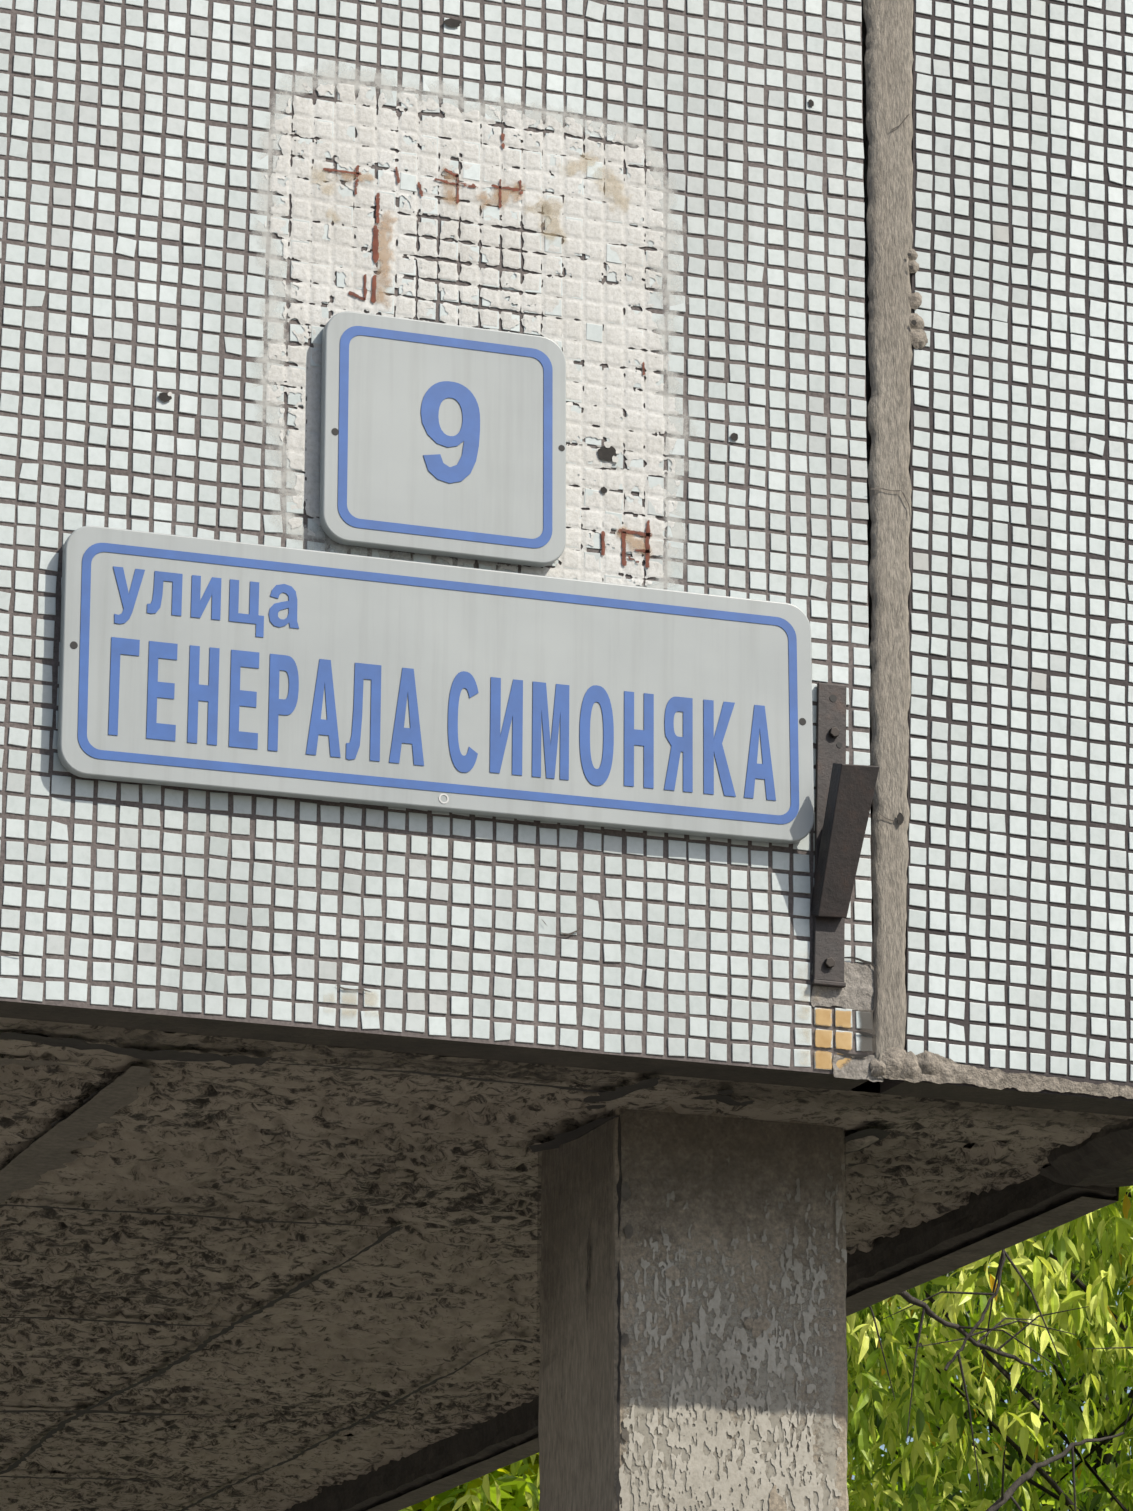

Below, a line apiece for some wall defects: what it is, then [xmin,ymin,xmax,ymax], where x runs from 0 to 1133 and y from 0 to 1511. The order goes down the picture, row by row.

rust [323,165,393,303]
rust [395,167,523,208]
peeling [257,67,685,589]
rust [601,520,652,568]
peeling [811,957,1133,1099]